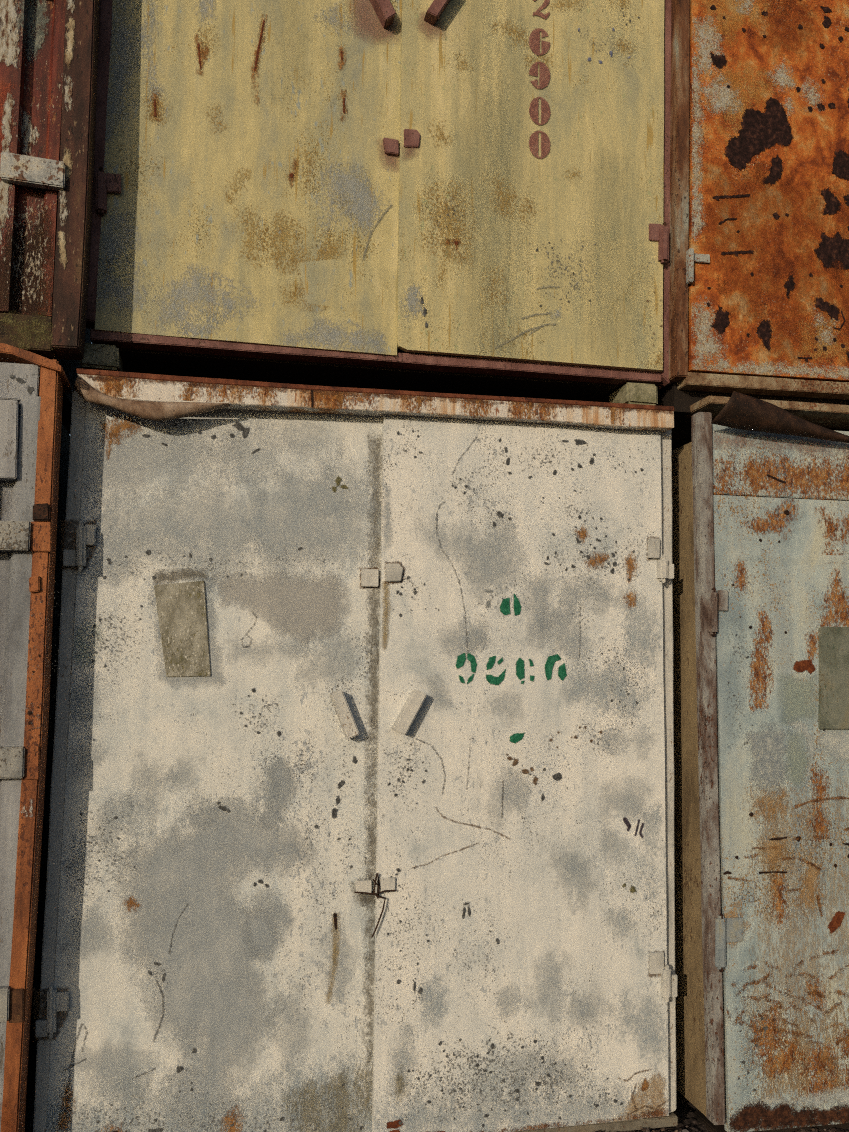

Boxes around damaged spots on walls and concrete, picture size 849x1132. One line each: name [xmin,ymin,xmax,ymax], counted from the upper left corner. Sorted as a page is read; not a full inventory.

peeling [0,0,49,67]
peeling [62,0,75,111]
rust [820,6,832,28]
peeling [0,149,72,311]
rust [87,375,673,425]
rust [585,553,609,569]
rust [624,554,637,607]
rust [713,452,849,674]
rust [748,611,787,712]
rust [749,762,849,929]
rust [828,911,845,933]
rust [729,1004,849,1132]